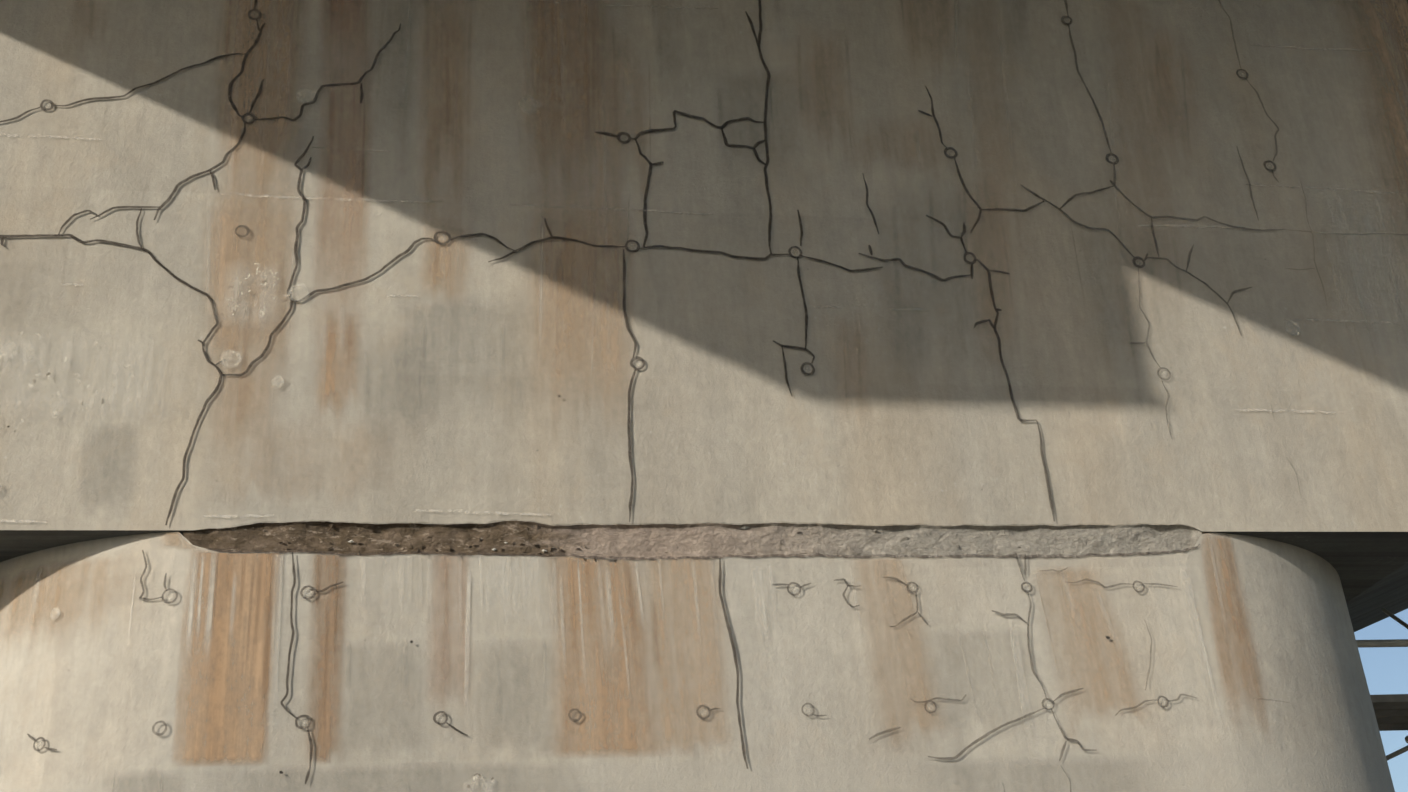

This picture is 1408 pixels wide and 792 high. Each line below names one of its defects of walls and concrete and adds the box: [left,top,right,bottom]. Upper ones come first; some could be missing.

crack [0,0,1280,525]
crack [139,550,178,603]
corrosion [184,552,275,762]
crack [281,552,343,784]
spalling [182,521,1202,560]
crack [697,558,748,769]
crack [870,695,966,739]
crack [928,553,1094,761]
crack [1071,579,1168,593]
crack [1119,694,1183,712]